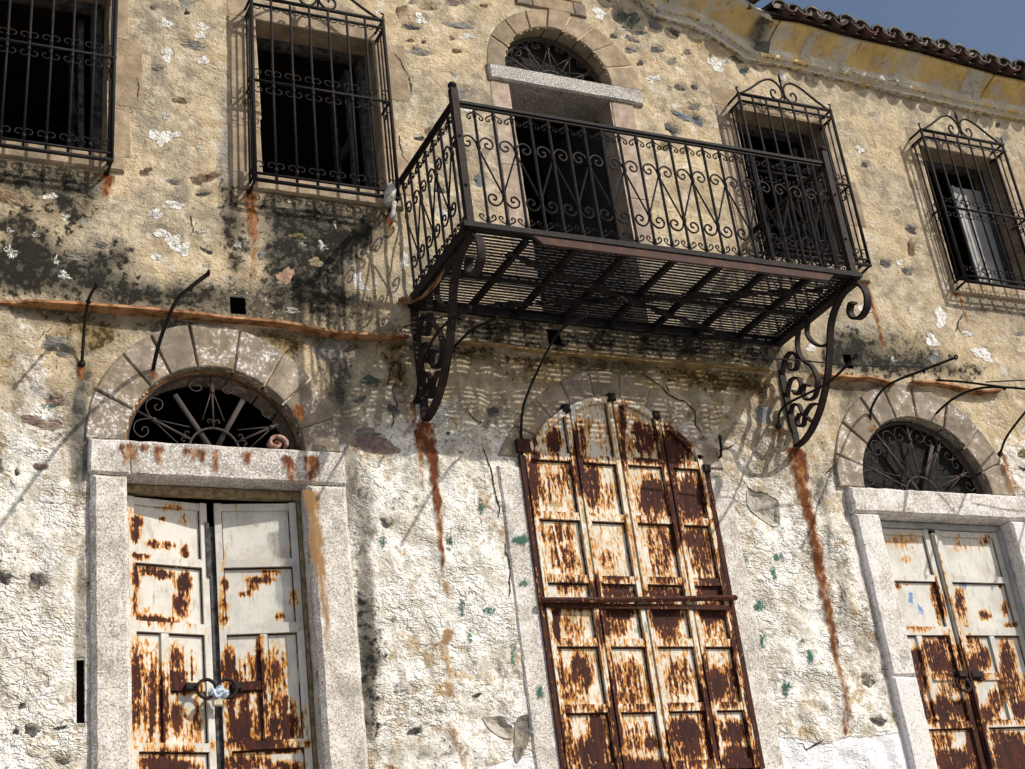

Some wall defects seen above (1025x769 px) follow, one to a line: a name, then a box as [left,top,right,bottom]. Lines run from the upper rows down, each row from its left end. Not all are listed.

flaking render [396,0,461,56]
flaking render [442,22,476,54]
flaking render [755,41,770,54]
leakage [0,169,382,318]
rust [245,193,259,277]
leakage [821,326,982,390]
rust [119,443,164,464]
rust [184,447,218,471]
rust [411,402,445,568]
rust [281,455,330,630]
rust [788,447,851,736]
rust [430,628,453,690]